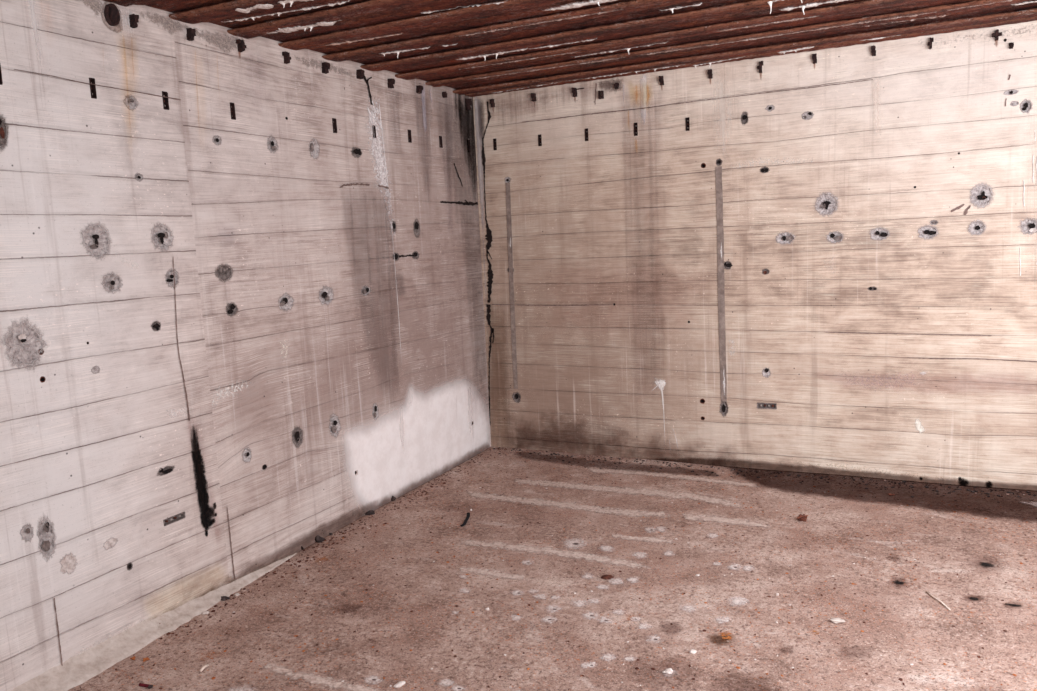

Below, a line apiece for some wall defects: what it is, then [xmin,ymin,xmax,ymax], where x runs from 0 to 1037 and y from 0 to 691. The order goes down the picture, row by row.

leakage [221,0,346,34]
leakage [444,0,1037,80]
leakage [366,101,401,348]
crack [440,101,612,423]
leakage [650,378,1037,506]